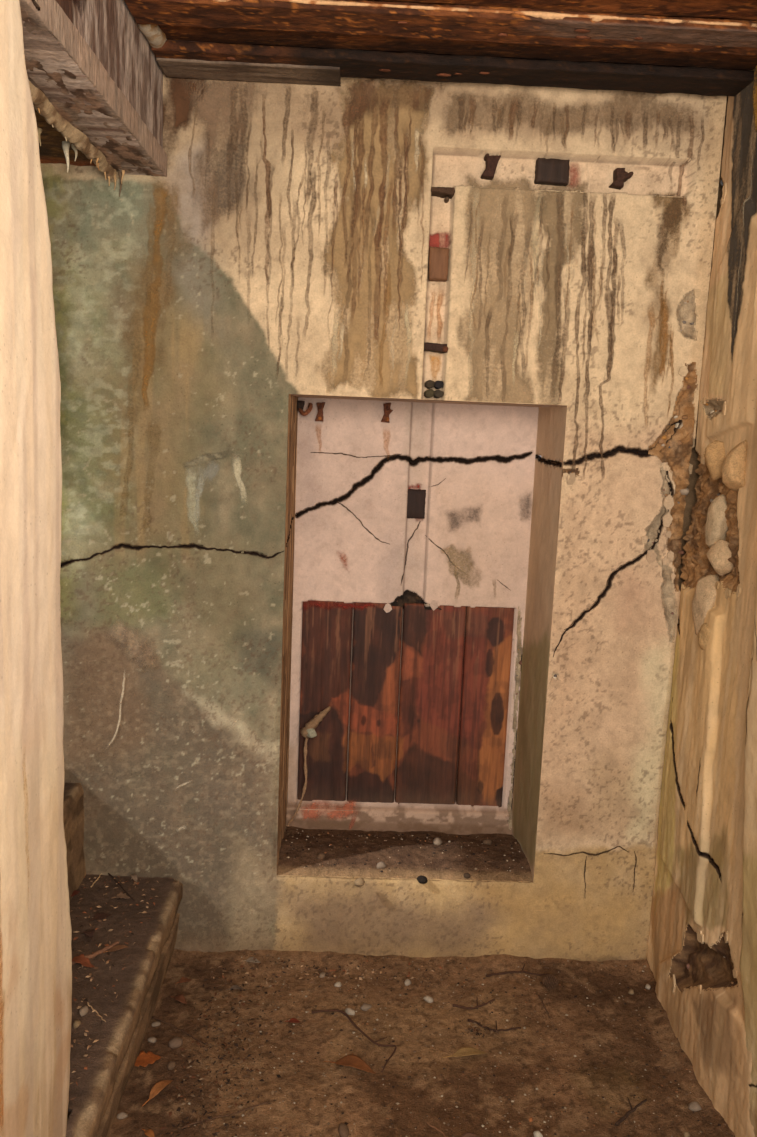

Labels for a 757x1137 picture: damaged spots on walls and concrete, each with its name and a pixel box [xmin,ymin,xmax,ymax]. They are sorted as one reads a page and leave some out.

damp [163,78,281,229]
damp [447,92,704,205]
damp [283,78,433,398]
damp [459,178,620,476]
flaking render [676,289,702,341]
damp [233,460,246,498]
crack [60,419,682,657]
flaking render [641,362,747,650]
flaking render [668,922,738,994]